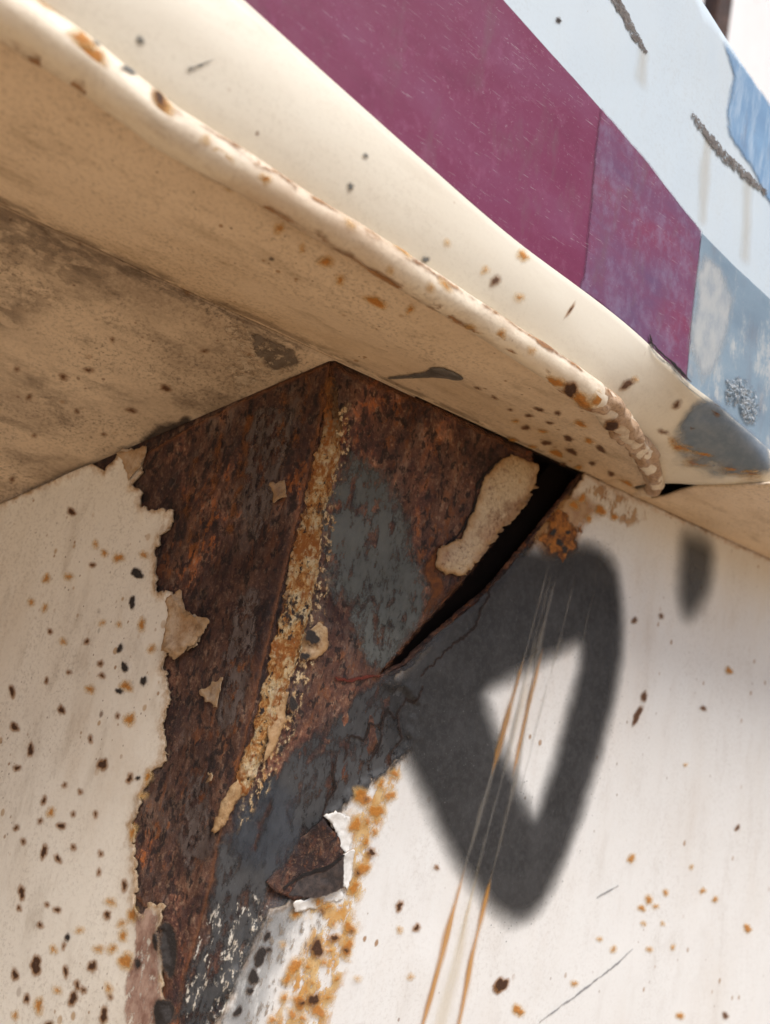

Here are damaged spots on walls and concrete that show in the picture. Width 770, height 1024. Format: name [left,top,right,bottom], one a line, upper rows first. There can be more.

corrosion [71,31,104,63]
corrosion [154,89,170,114]
peeling [93,325,539,620]
peeling [161,540,220,688]
peeling [189,407,325,783]
corrosion [87,364,637,1024]
crack [322,458,576,819]
corrosion [633,691,647,725]
corrosion [38,796,75,829]
peeling [125,744,398,1024]
corrosion [30,956,41,976]
corrosion [55,966,86,1005]